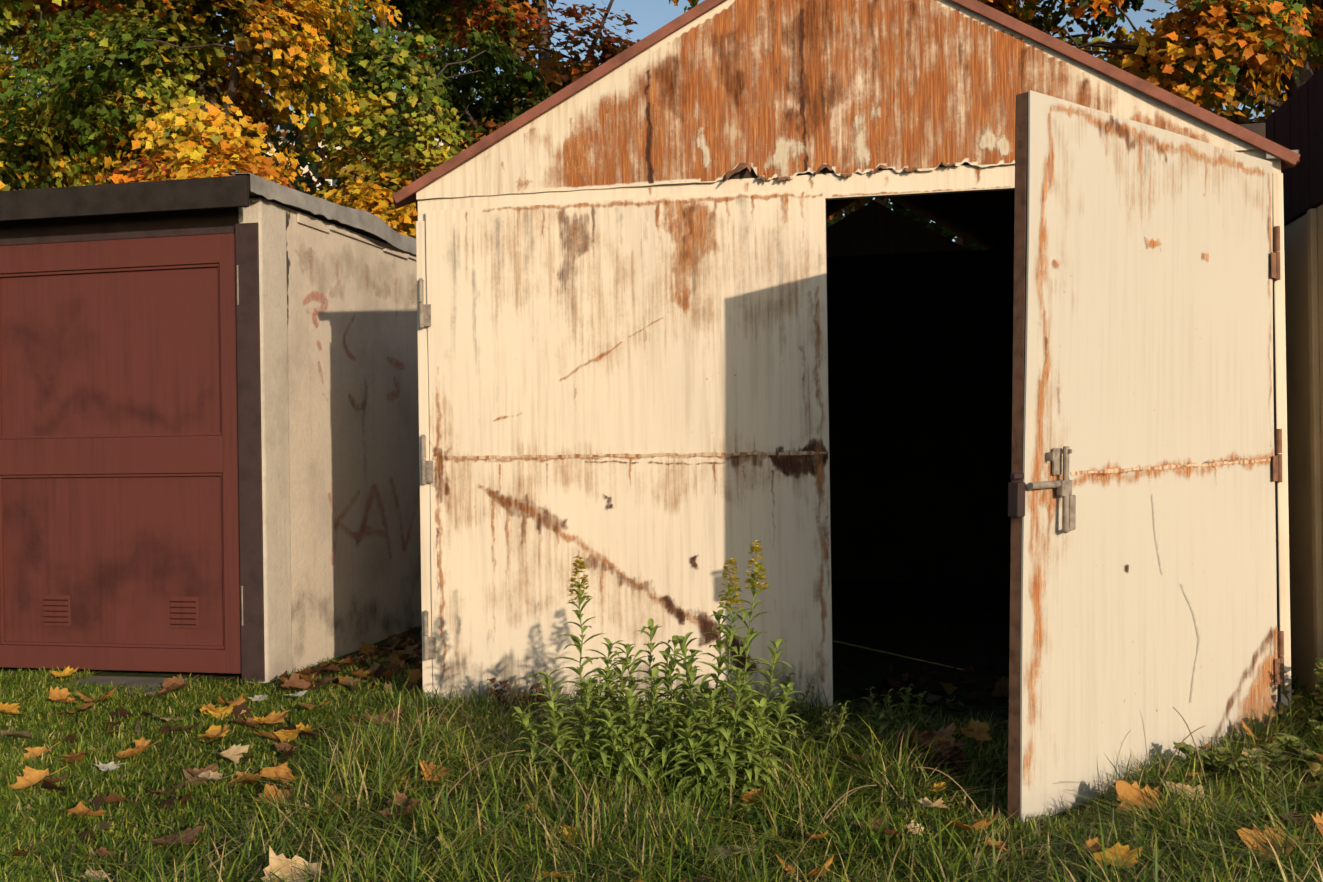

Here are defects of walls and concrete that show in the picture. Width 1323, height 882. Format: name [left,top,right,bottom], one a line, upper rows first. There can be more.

corrosion [488,0,1273,550]
corrosion [433,394,756,674]
corrosion [819,528,828,637]
corrosion [1029,564,1045,709]
corrosion [1216,627,1278,738]